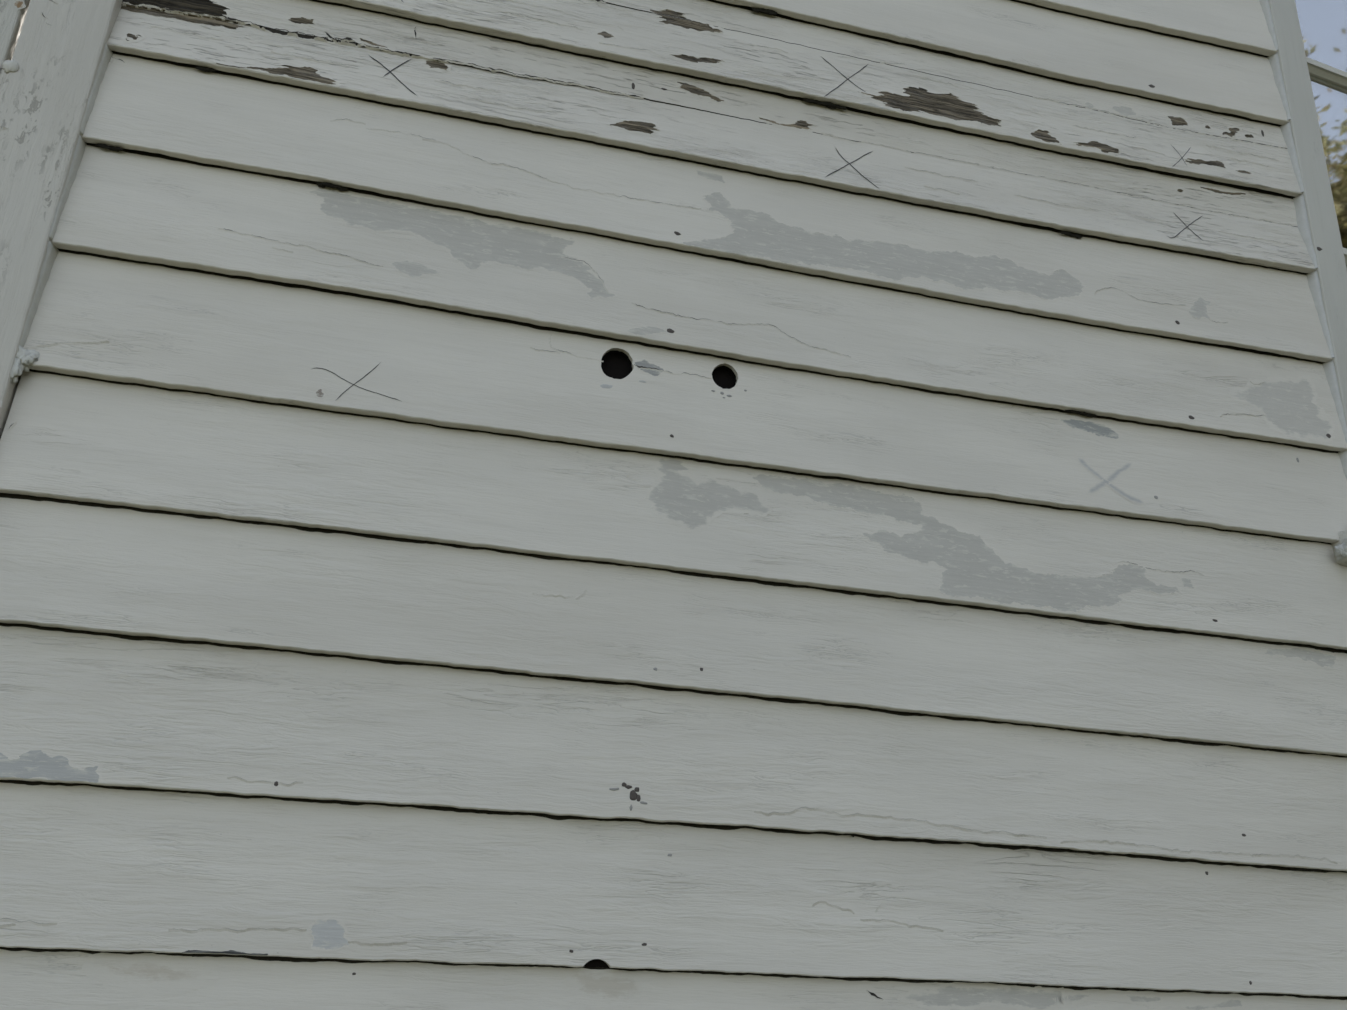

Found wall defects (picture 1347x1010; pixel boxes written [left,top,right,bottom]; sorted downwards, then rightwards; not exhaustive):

peeling [121,2,644,99]
peeling [649,8,724,34]
crack [330,119,701,210]
peeling [606,119,661,137]
peeling [851,85,1002,127]
peeling [821,132,1293,226]
peeling [1028,127,1121,155]
peeling [309,186,618,301]
peeling [675,168,1086,303]
peeling [644,456,1183,614]
peeling [0,747,104,783]